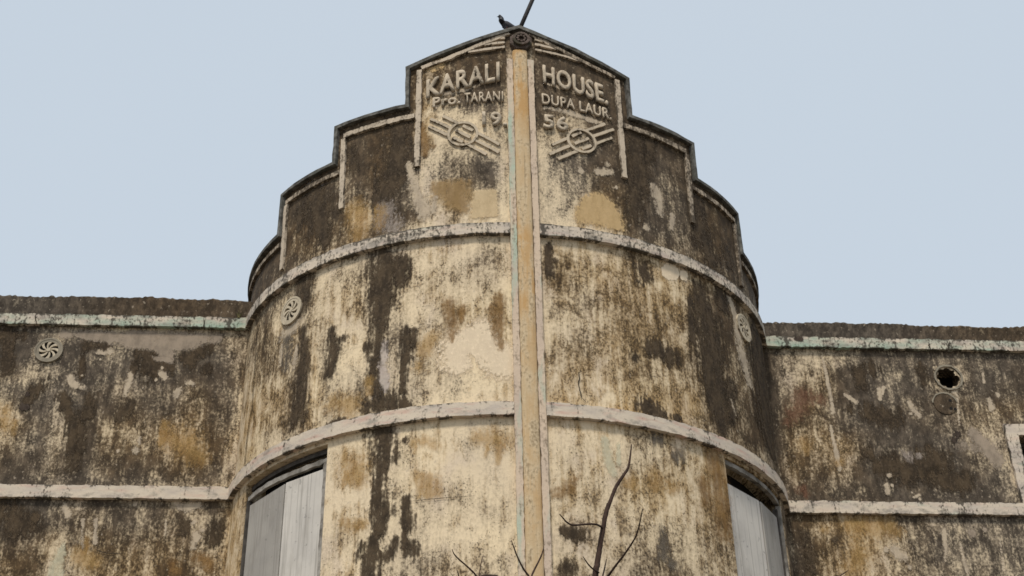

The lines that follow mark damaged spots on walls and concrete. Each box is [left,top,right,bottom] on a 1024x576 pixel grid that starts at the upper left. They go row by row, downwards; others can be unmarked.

leakage [20,374,99,472]
leakage [75,339,113,379]
leakage [115,398,136,423]
leakage [293,176,339,253]
leakage [346,144,360,175]
leakage [362,246,418,402]
leakage [371,113,426,233]
leakage [543,242,558,279]
leakage [621,119,778,464]
leakage [821,355,904,471]
leakage [914,361,942,389]
leakage [354,426,421,576]